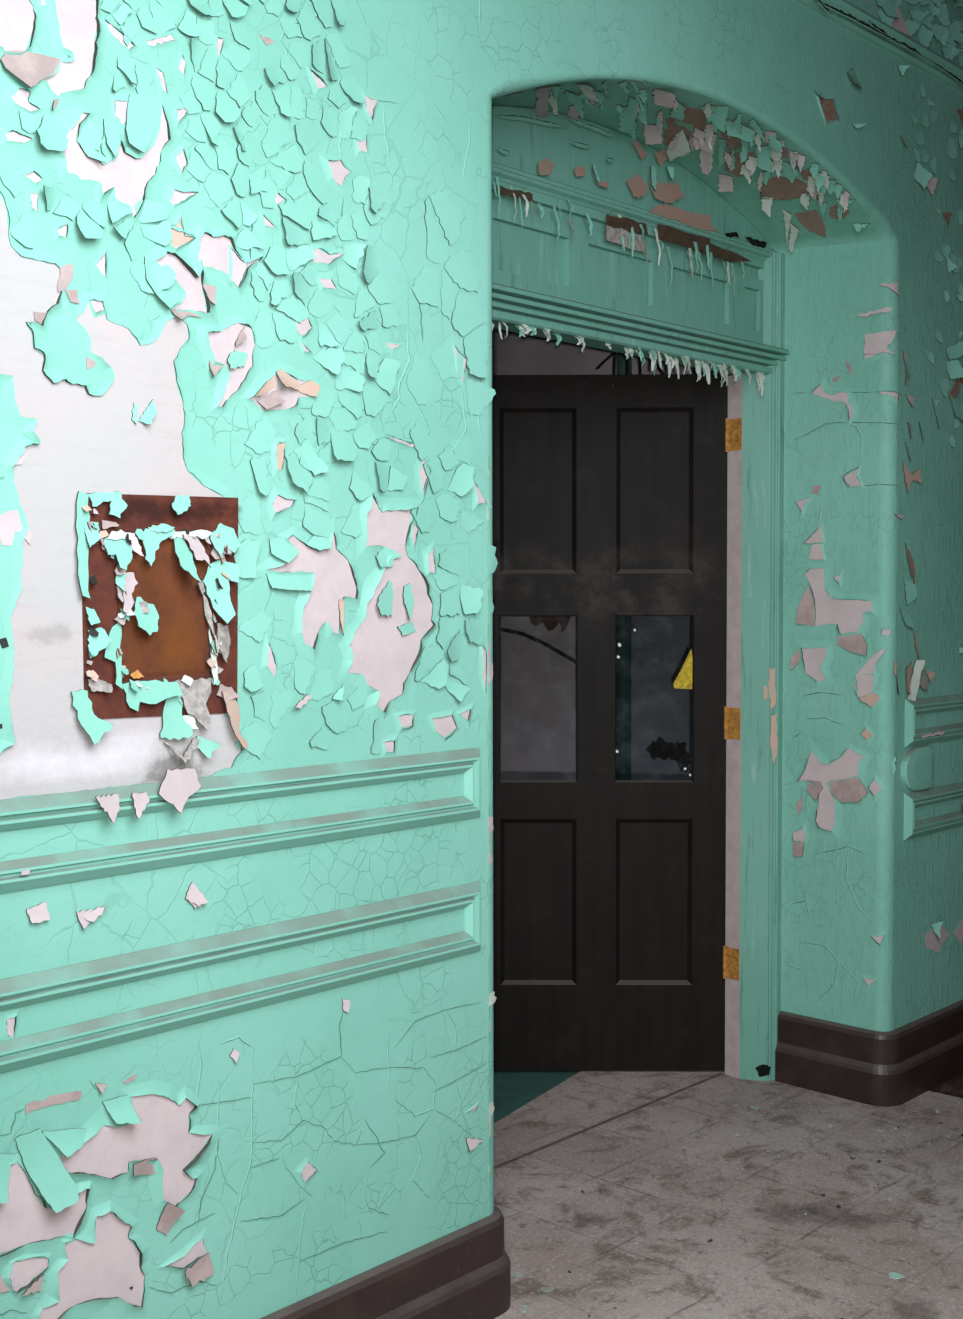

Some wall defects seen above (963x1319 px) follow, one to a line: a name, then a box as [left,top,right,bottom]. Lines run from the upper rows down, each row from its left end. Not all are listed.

peeling [504,79,870,296]
corrosion [121,501,172,520]
flaking render [0,0,593,823]
peeling [605,343,765,396]
peeling [800,330,924,492]
peeling [763,668,778,764]
peeling [790,485,936,857]
crack [0,1109,24,1138]
peeling [0,1073,228,1319]
crack [149,1002,485,1301]
peeling [463,955,496,1184]
crack [0,1309,24,1317]